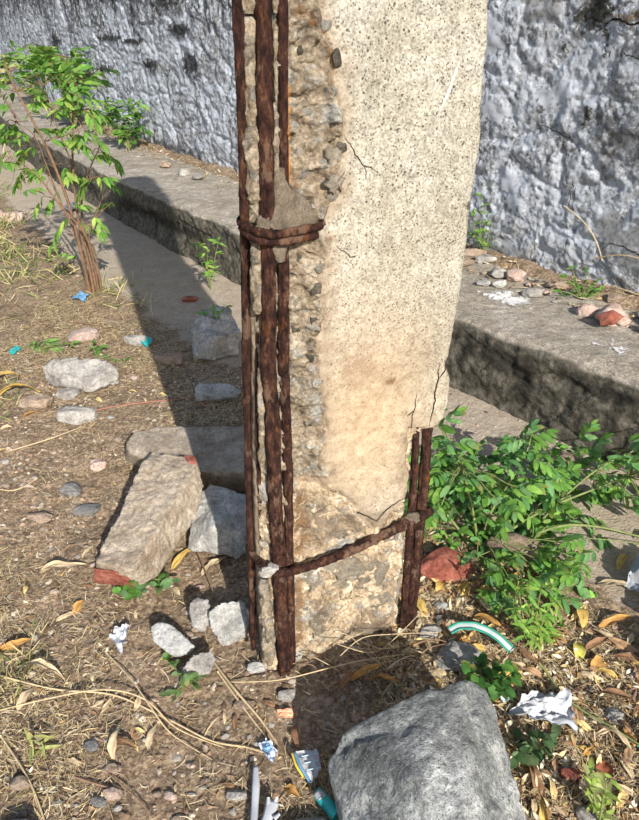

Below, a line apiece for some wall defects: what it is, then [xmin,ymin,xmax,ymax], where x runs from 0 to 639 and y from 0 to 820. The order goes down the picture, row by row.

water stain [0,0,200,81]
water stain [562,0,639,62]
water stain [140,135,205,160]
corrosion [287,85,298,189]
spalling [231,0,433,678]
crack [409,365,453,428]